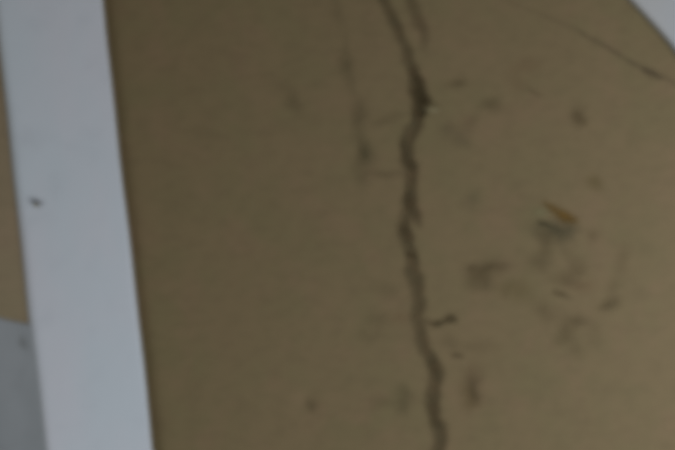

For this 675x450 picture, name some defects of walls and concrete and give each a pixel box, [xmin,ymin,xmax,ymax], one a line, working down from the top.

crack [382,0,457,450]